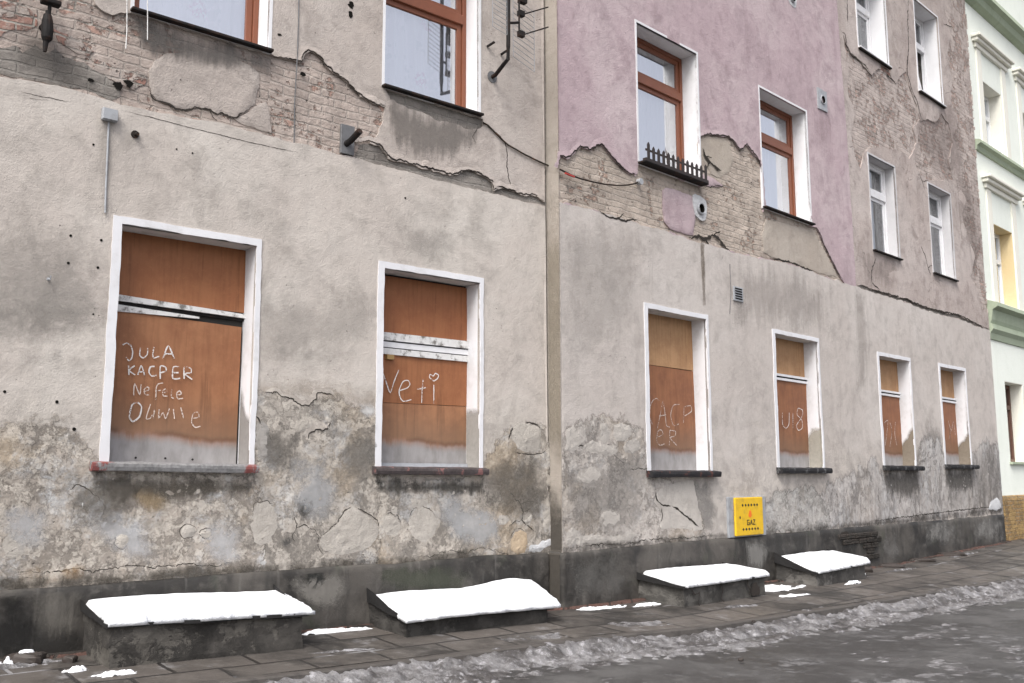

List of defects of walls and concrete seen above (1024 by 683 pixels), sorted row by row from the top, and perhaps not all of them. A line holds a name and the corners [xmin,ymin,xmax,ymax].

spalling [0,0,545,206]
crack [355,128,545,200]
spalling [556,135,843,283]
spalling [844,0,987,312]
crack [772,232,987,328]
spalling [858,285,987,329]
crack [256,386,339,440]
water stain [64,566,276,585]
flaking render [0,390,706,626]
water stain [529,506,637,603]
water stain [885,429,919,495]
water stain [946,434,972,491]